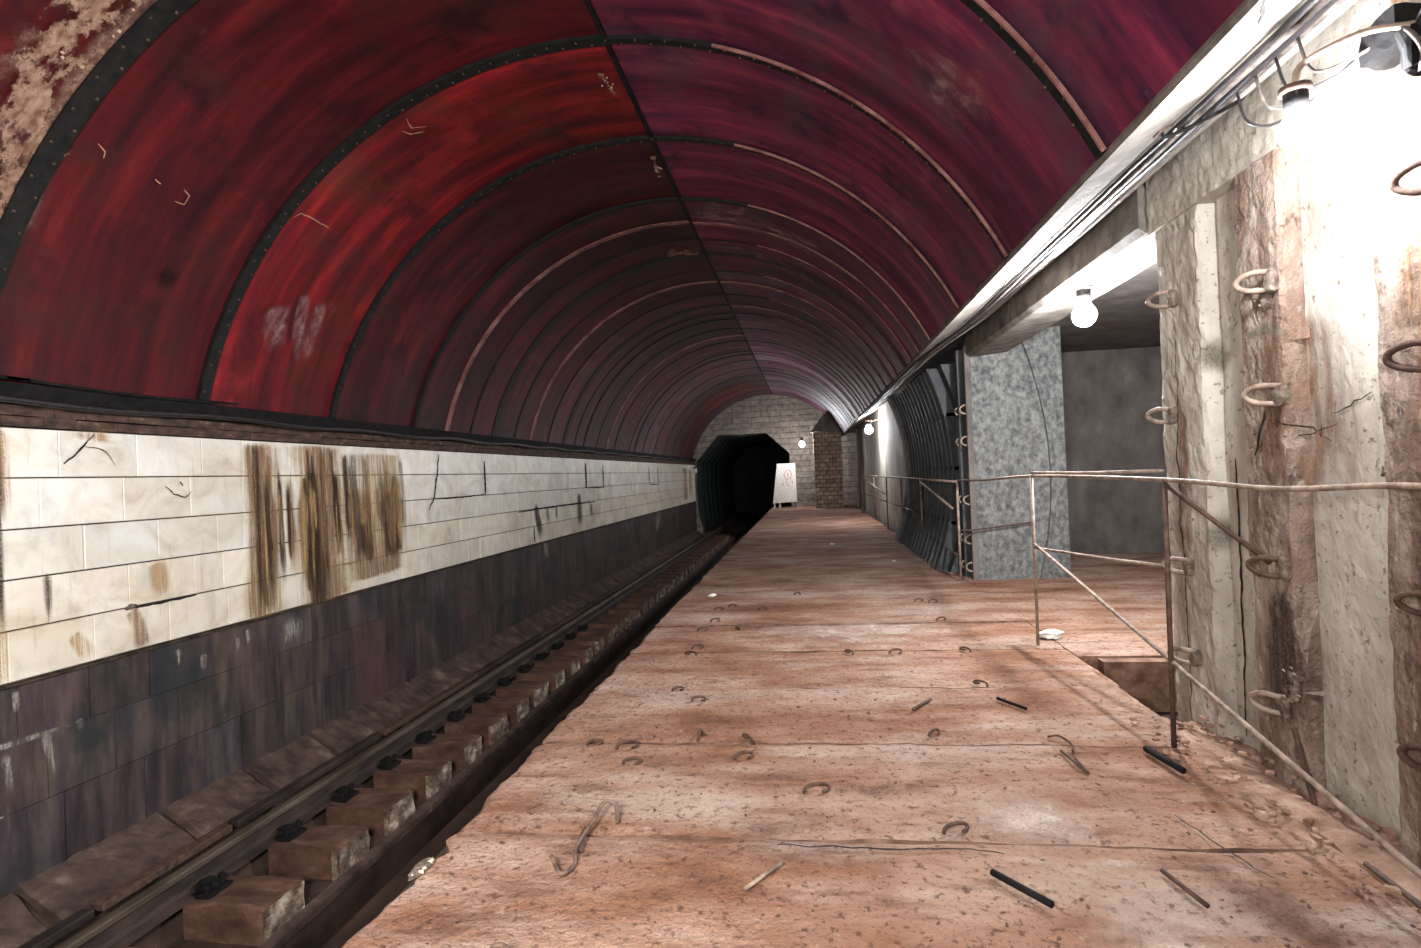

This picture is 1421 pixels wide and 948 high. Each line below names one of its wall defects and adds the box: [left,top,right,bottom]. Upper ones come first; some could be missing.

peeling [0,0,148,218]
rust [246,445,294,618]
rust [350,455,406,579]